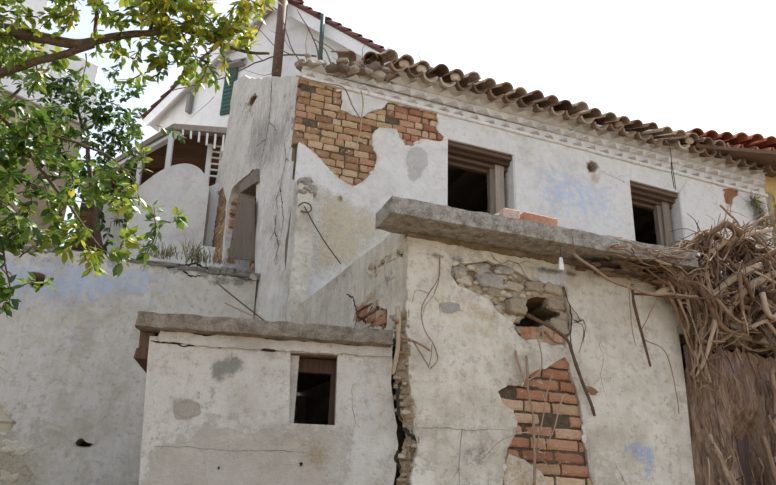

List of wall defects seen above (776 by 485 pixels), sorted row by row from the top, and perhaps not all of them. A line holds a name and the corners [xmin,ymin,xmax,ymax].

flaking render [291,53,443,187]
crack [255,83,288,261]
spalling [586,160,599,173]
spalling [722,188,738,205]
flaking render [354,294,387,330]
spalling [440,297,463,313]
spalling [450,262,570,348]
damp [213,357,242,380]
flaking render [498,358,592,485]